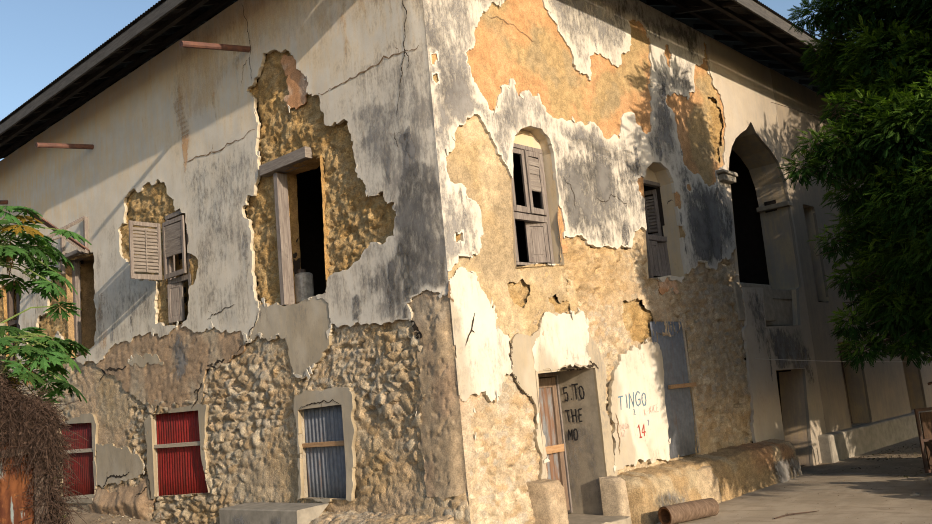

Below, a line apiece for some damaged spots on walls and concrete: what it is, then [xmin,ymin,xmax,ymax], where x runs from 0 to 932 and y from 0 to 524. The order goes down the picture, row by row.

spalling [96,176,335,413]
crack [184,129,255,163]
spalling [250,50,396,276]
crack [318,0,419,147]
damp [369,126,475,318]
damp [425,0,486,151]
spalling [438,115,671,480]
peeling [466,0,653,139]
damp [556,127,639,245]
damp [554,0,697,55]
peeling [666,42,725,189]
damp [679,169,733,264]